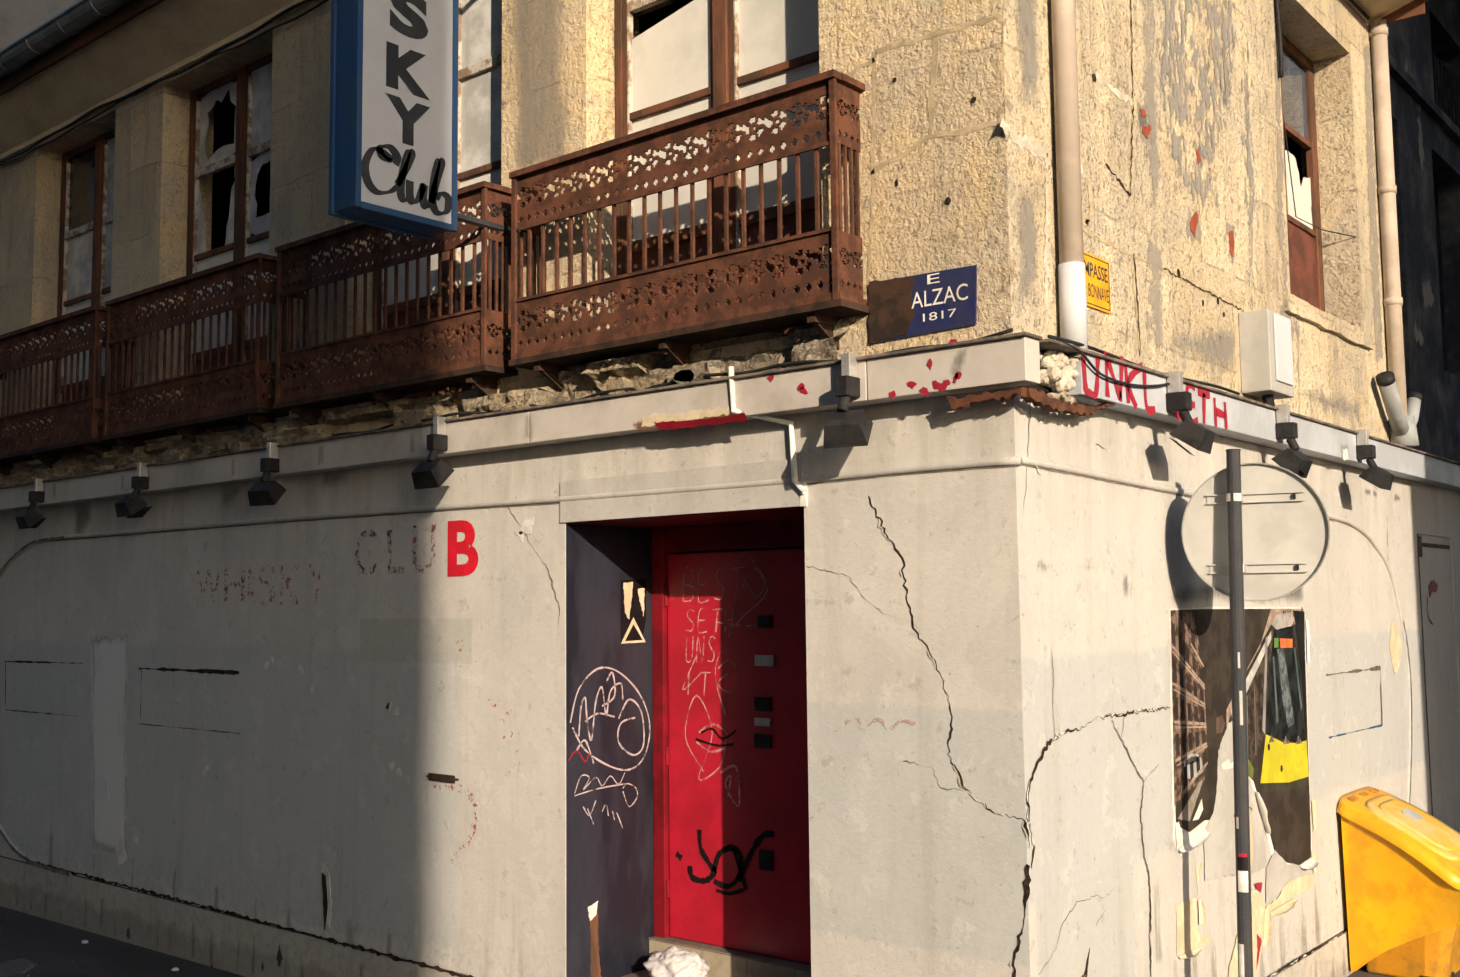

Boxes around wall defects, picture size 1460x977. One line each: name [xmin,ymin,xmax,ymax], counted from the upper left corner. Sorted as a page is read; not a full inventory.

peeling [1137,0,1259,263]
spalling [0,318,850,487]
spalling [946,350,1115,416]
crack [807,496,1172,977]